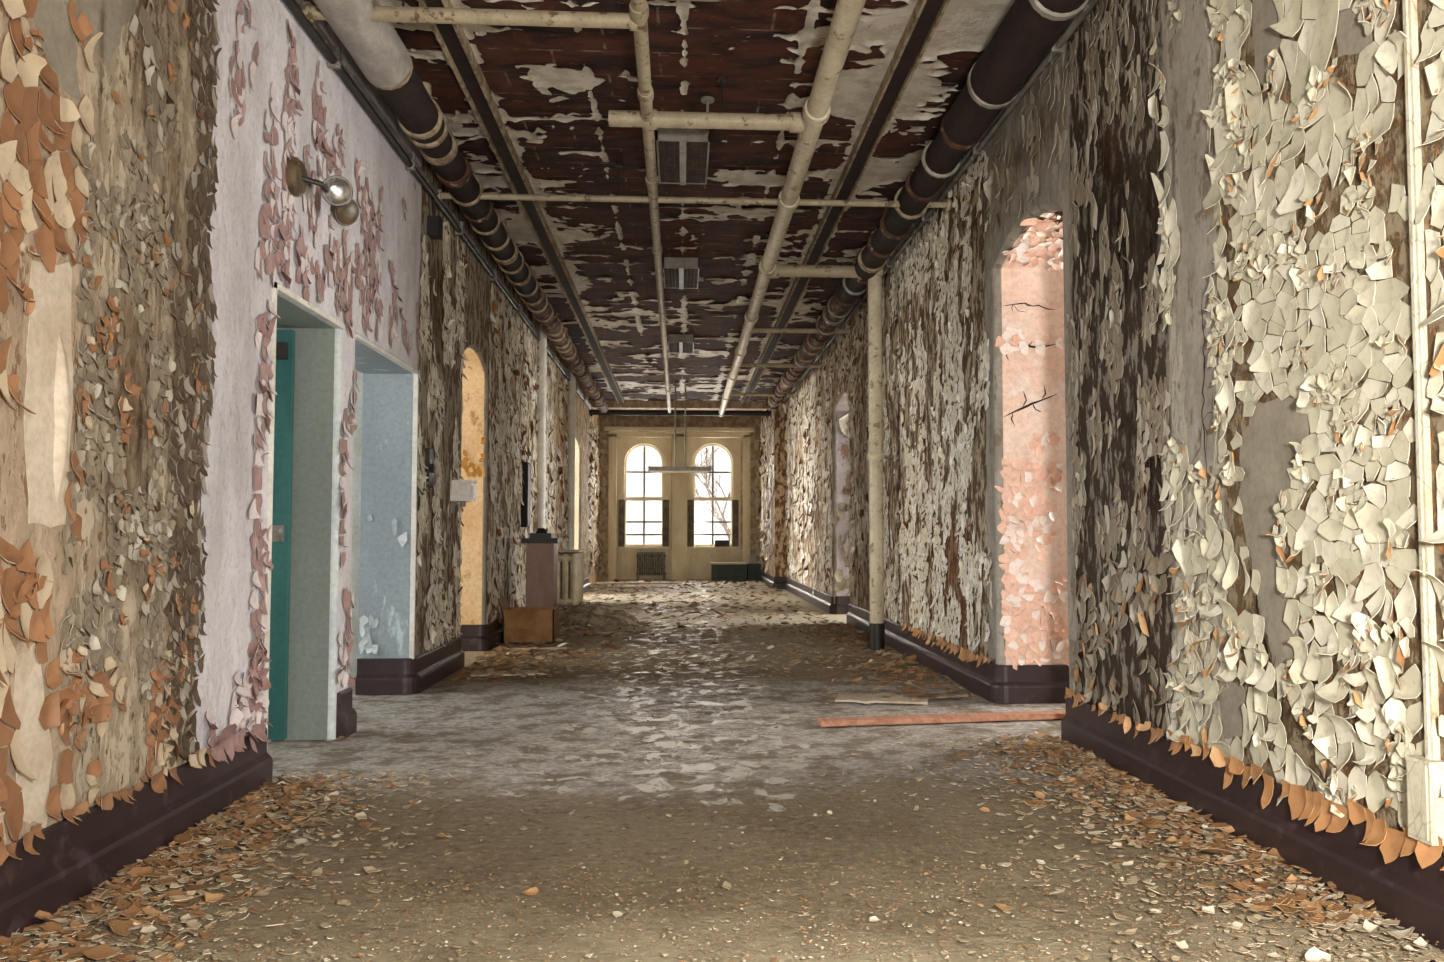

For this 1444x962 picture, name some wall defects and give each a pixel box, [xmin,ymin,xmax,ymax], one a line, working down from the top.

peeling [0,0,570,866]
flaking render [432,0,1444,870]
crack [1002,302,1055,360]
crack [1004,387,1057,426]